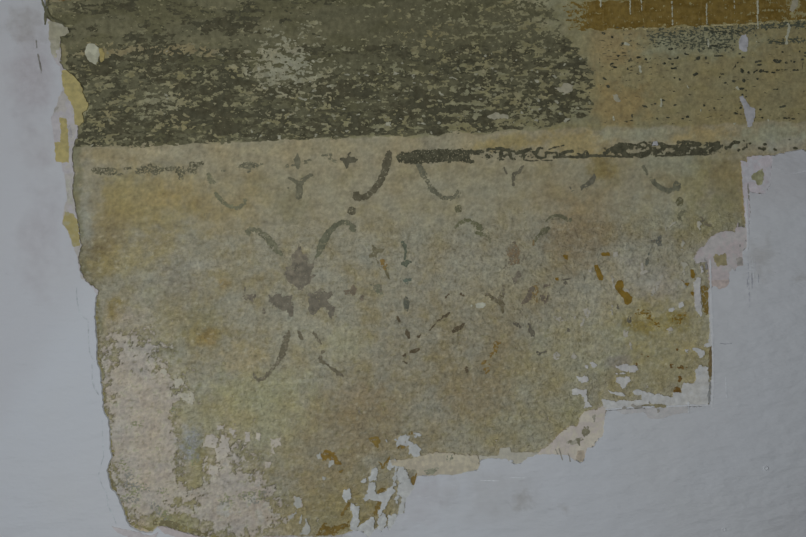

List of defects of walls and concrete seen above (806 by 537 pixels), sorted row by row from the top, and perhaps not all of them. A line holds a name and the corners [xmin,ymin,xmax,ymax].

peeling [342,155,773,537]